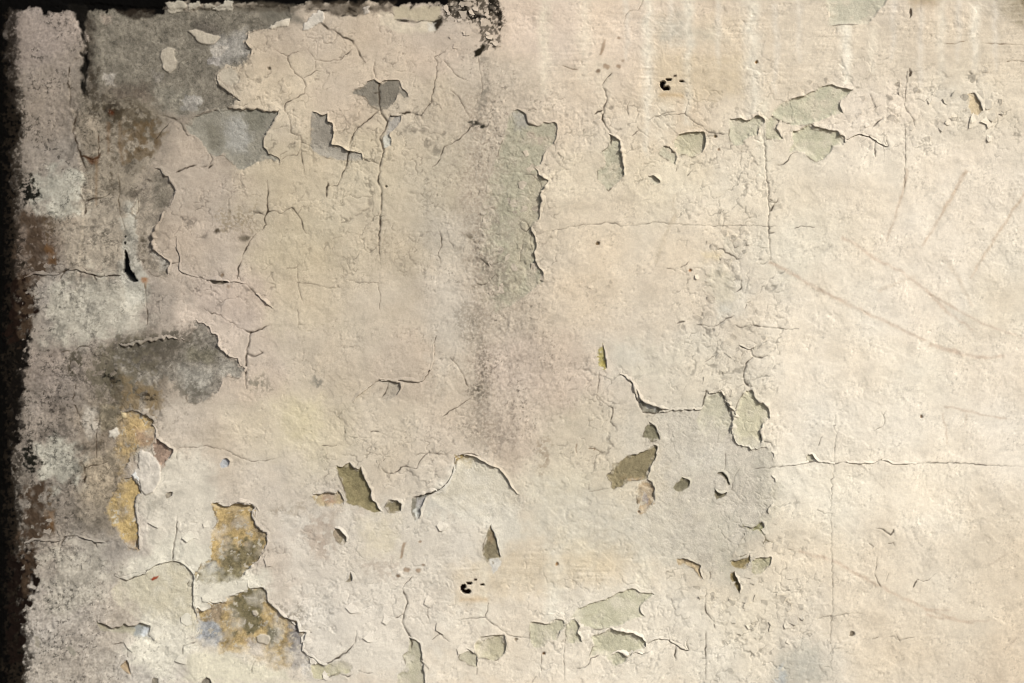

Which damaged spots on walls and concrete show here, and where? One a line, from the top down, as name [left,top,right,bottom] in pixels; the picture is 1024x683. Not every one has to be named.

damp [18,170,44,207]
damp [78,63,172,201]
flaking render [80,0,281,170]
crack [23,6,475,390]
damp [16,439,45,475]
crack [60,345,113,485]
peeling [36,475,353,681]
damp [62,313,383,506]
crack [351,335,471,418]
peeling [309,451,521,564]
peeling [605,333,805,646]
crack [393,67,1024,683]